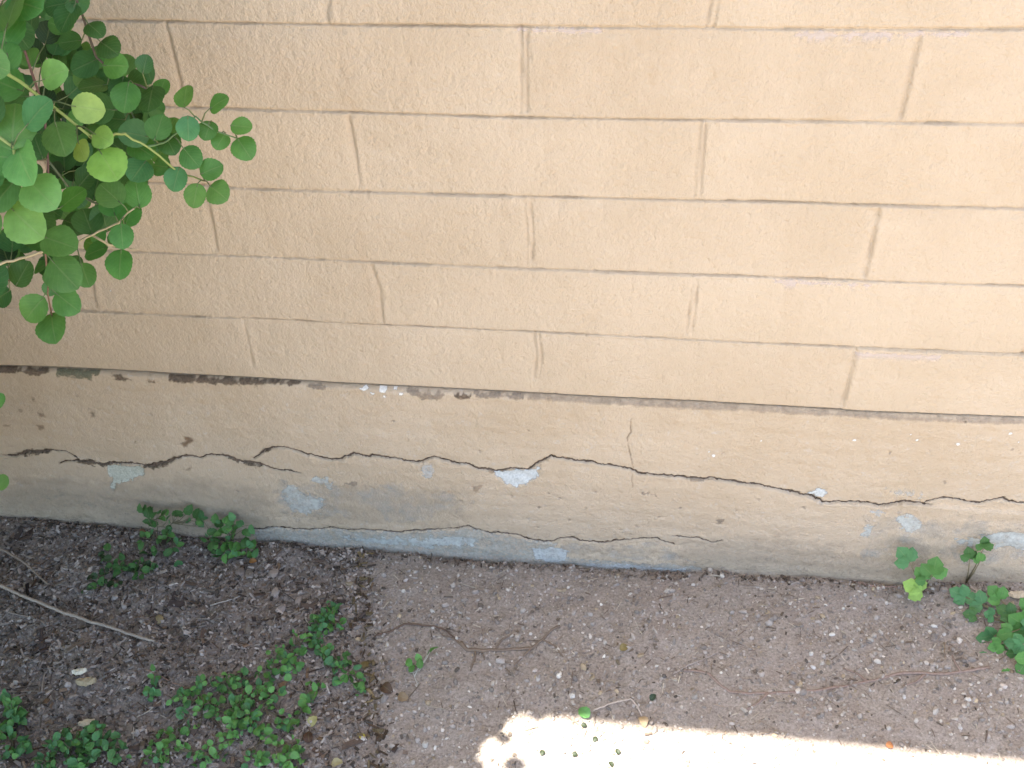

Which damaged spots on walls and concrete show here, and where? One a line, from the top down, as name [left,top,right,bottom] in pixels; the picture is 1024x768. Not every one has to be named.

peeling [360,384,403,398]
crack [8,418,1023,506]
spalling [107,463,145,489]
spalling [494,467,540,488]
crack [254,525,721,544]